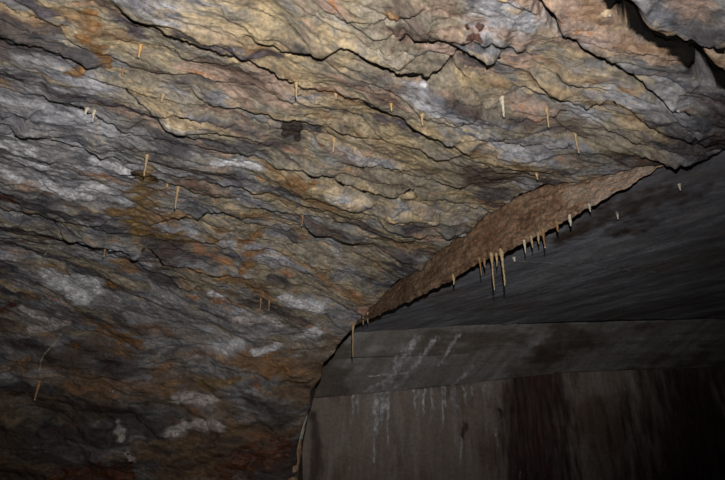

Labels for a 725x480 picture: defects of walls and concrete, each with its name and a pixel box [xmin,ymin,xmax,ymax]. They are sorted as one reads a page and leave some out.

damp [352,336,437,463]
damp [412,365,473,428]